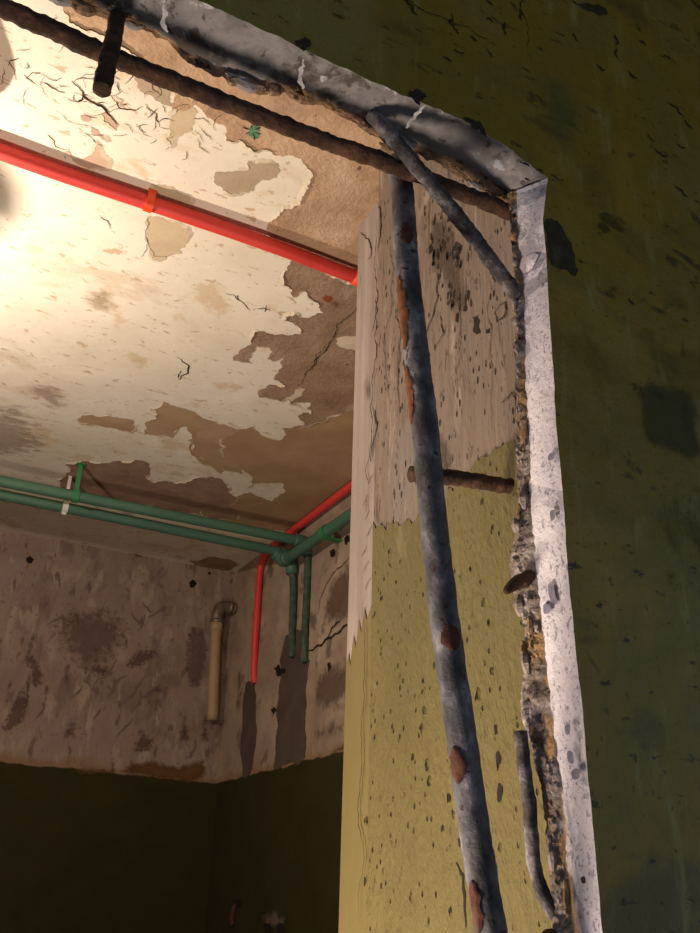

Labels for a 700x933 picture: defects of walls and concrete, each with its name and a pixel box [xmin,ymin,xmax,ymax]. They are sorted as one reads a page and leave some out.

crack [1,50,224,160]
peeling [121,13,395,153]
peeling [134,76,379,269]
peeling [57,261,357,531]
leakage [640,384,699,456]
spalling [401,135,586,933]
leakage [2,656,48,729]
leakage [55,615,125,684]
leakage [186,630,208,686]
crack [308,558,365,913]
corrosion [441,623,461,651]
corrosion [449,748,467,784]